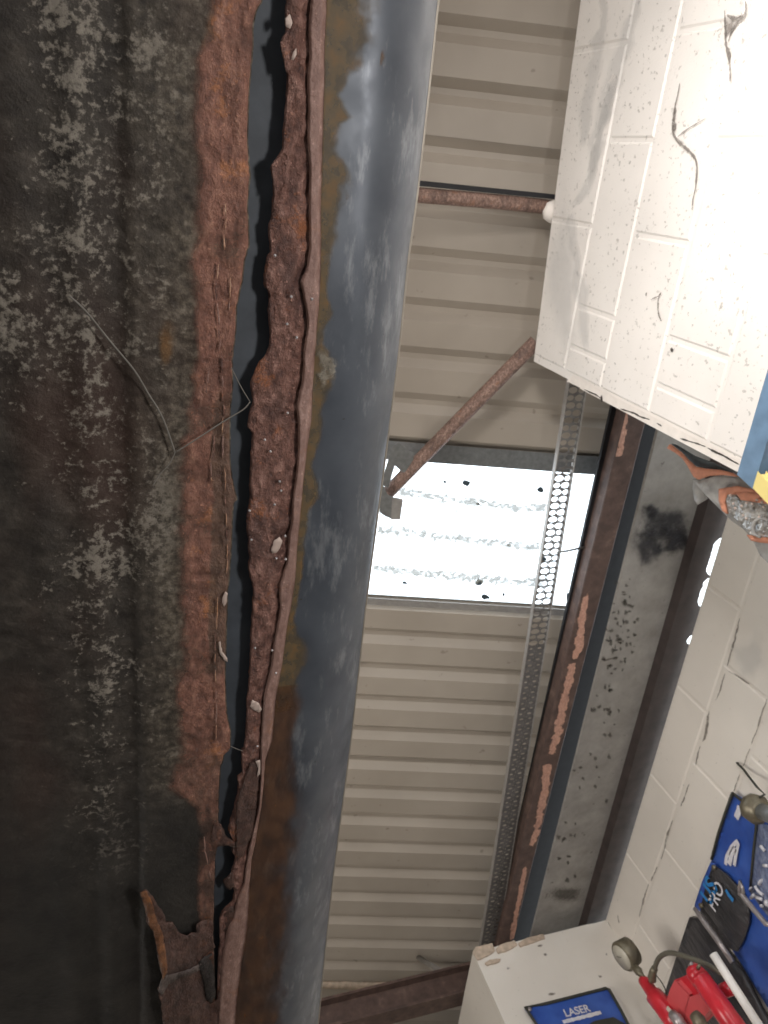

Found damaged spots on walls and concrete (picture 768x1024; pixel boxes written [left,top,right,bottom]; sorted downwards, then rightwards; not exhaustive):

corrosion [170,0,367,1024]
peeling [529,594,589,846]
mould [555,856,578,899]
mould [602,583,639,692]
mould [637,506,688,563]
crack [639,619,767,916]